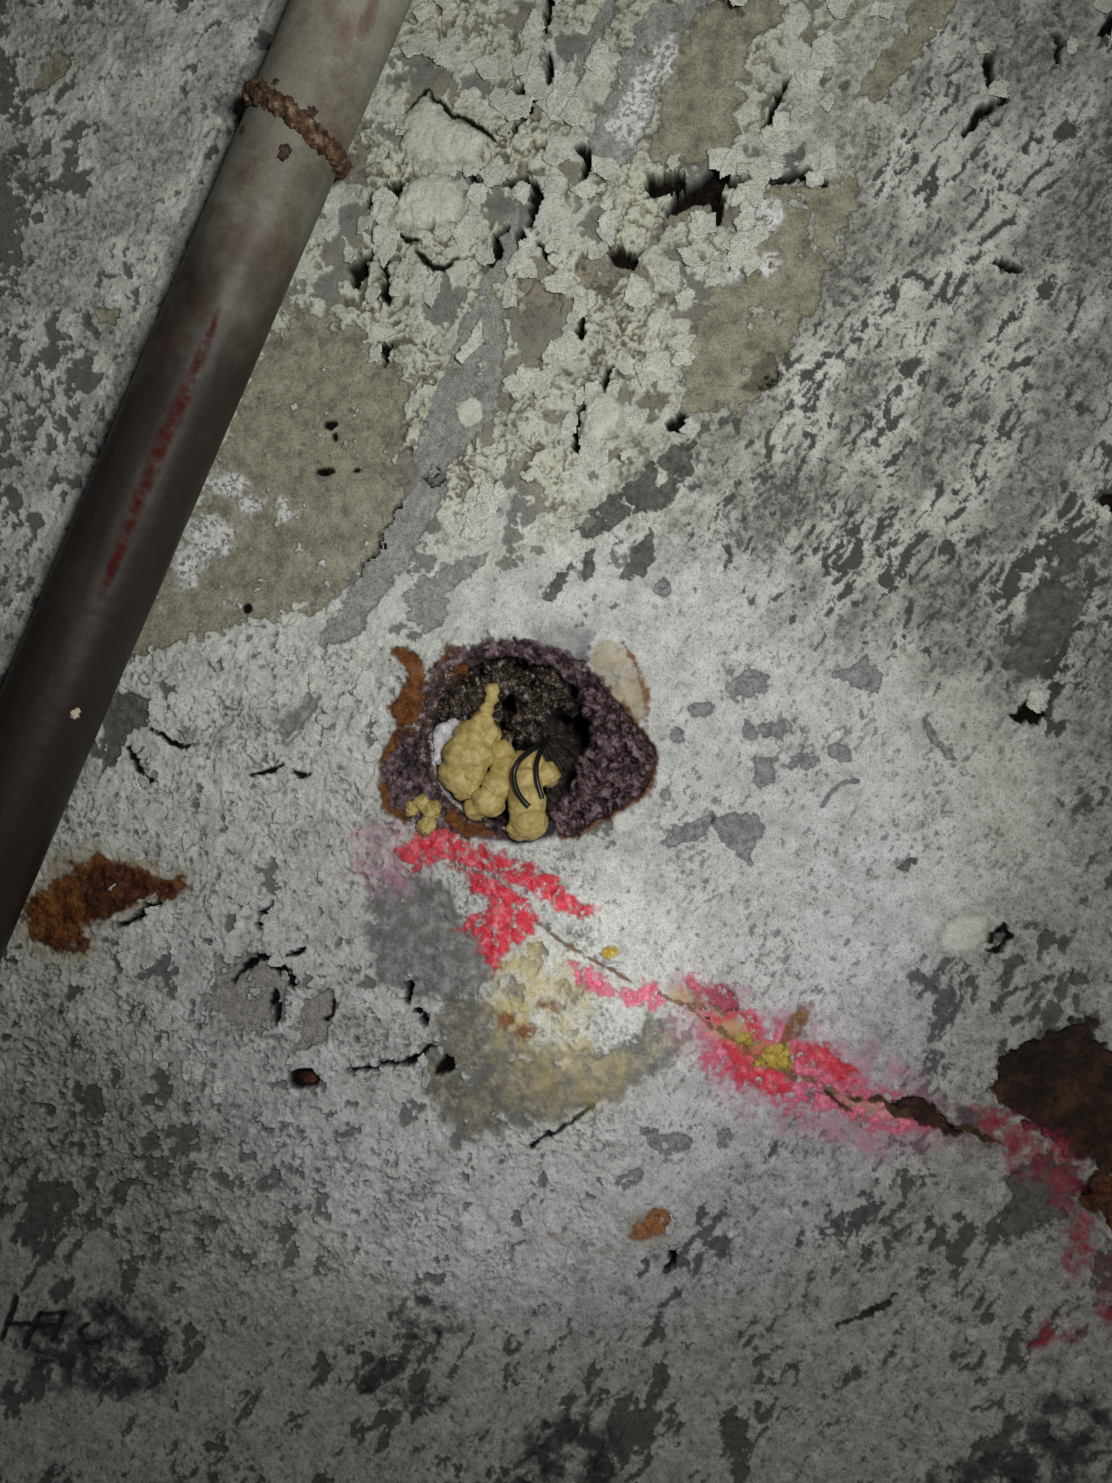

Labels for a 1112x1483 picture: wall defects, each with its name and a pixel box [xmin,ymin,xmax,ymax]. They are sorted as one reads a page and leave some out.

flaking render [853,0,956,102]
peeling [962,40,1010,138]
peeling [980,250,1020,274]
flaking render [98,0,861,771]
peeling [832,654,882,693]
corrosion [378,643,509,841]
spalling [499,669,670,836]
peeling [741,720,851,788]
spalling [487,800,510,827]
corrosion [24,850,189,956]
crack [530,917,1001,1148]
corrosion [629,1208,675,1240]